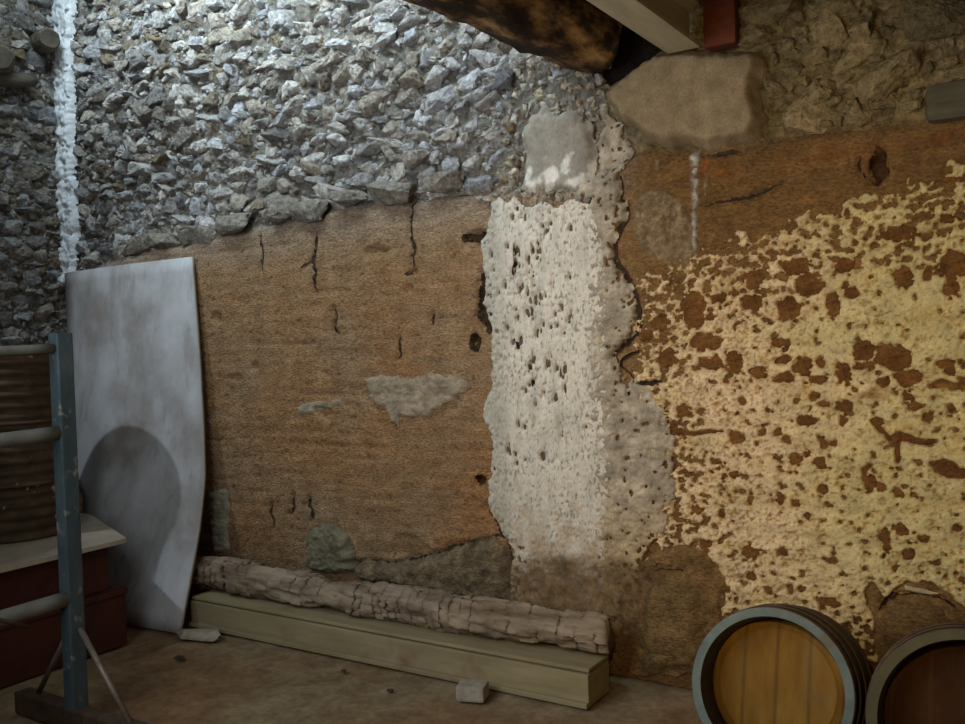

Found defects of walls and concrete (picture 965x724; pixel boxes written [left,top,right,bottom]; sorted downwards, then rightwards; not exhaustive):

crack [300,232,318,290]
crack [405,195,467,275]
leakage [634,150,701,266]
crack [701,183,783,209]
peeling [639,250,965,427]
peeling [667,406,746,445]
peeling [759,427,837,469]
peeling [870,417,936,461]
peeling [931,459,965,479]
peeling [879,522,916,573]
flaking render [629,539,731,679]
flaking render [866,559,965,663]